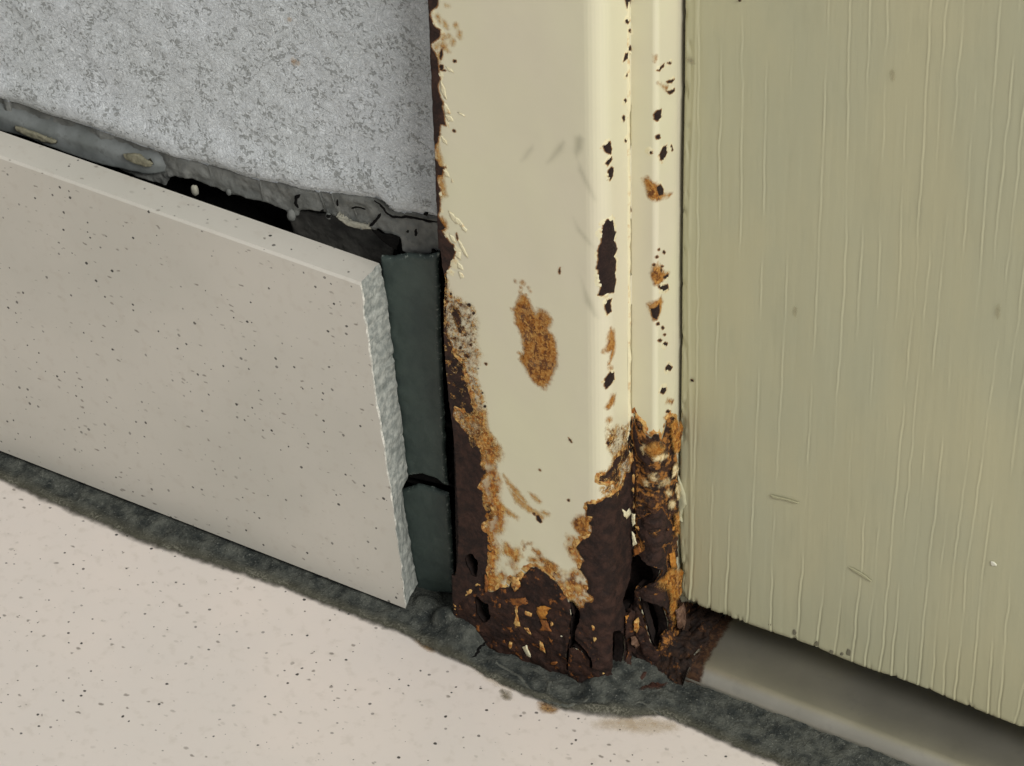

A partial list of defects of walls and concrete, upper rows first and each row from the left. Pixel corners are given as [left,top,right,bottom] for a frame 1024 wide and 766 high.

peeling [600,138,614,182]
peeling [645,109,674,164]
peeling [593,214,619,316]
corrosion [428,0,733,689]
peeling [648,248,673,396]
peeling [601,368,616,389]
crack [408,473,455,487]